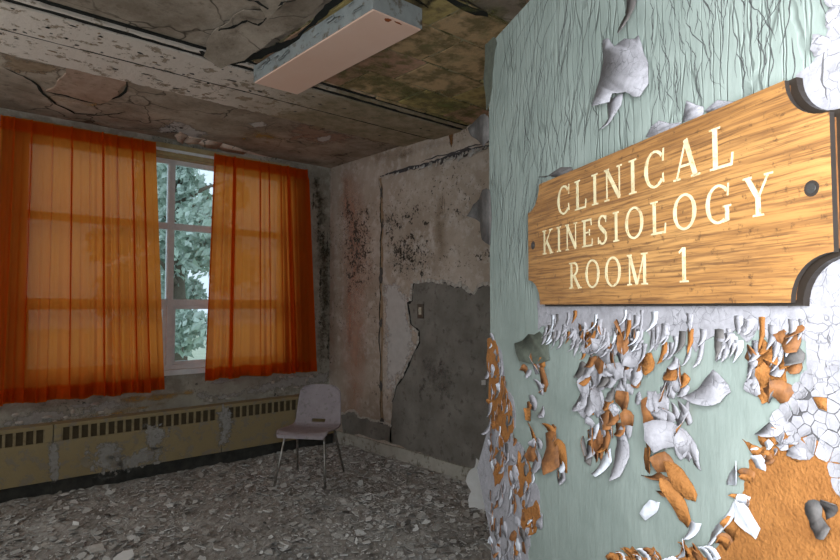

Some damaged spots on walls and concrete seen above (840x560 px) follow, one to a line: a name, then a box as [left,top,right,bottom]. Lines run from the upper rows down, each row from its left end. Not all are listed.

crack [3,67,128,116]
flaking render [204,0,364,86]
spalling [322,0,509,146]
crack [490,0,608,283]
peeling [592,0,649,131]
peeling [646,100,733,137]
crack [649,0,826,126]
peeling [796,0,840,110]
crack [820,53,828,100]
water stain [342,199,373,293]
peeling [467,188,492,245]
spalling [341,259,840,560]